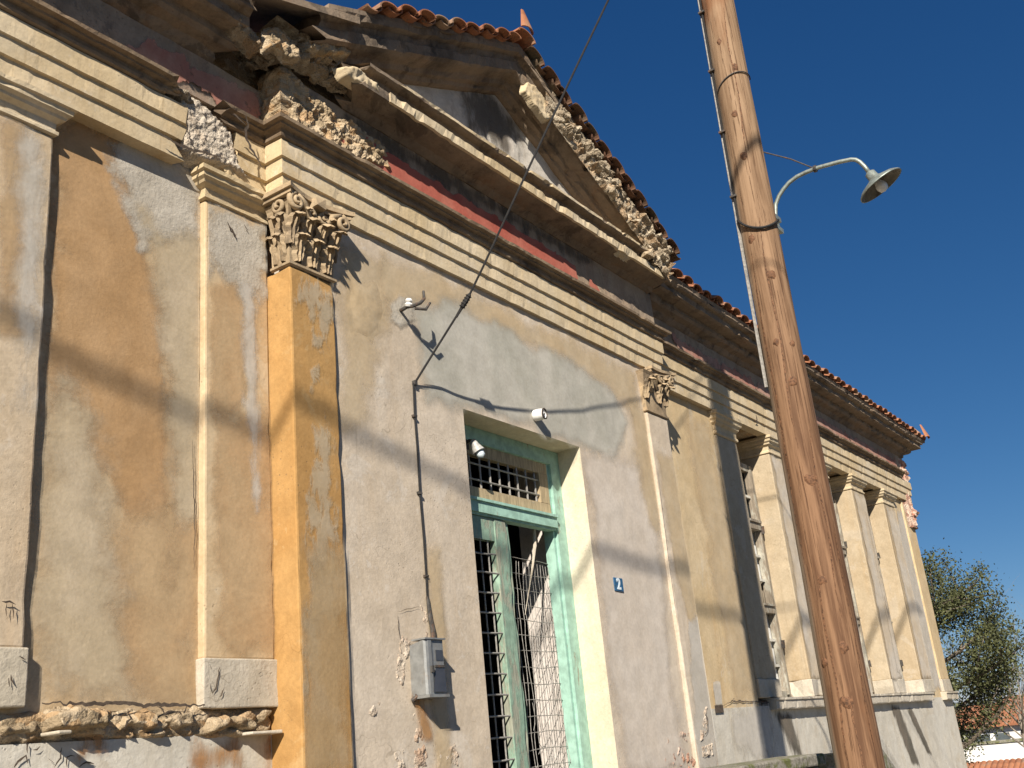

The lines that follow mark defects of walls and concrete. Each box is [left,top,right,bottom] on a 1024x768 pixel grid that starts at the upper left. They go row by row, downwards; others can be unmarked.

spalling [165,86,248,178]
spalling [225,15,600,292]
spalling [519,82,676,282]
crack [190,440,198,555]
peeling [305,428,338,591]
crack [2,600,16,618]
crack [42,666,224,729]
spalling [0,703,283,745]
spalling [396,635,412,688]
spalling [665,681,724,768]